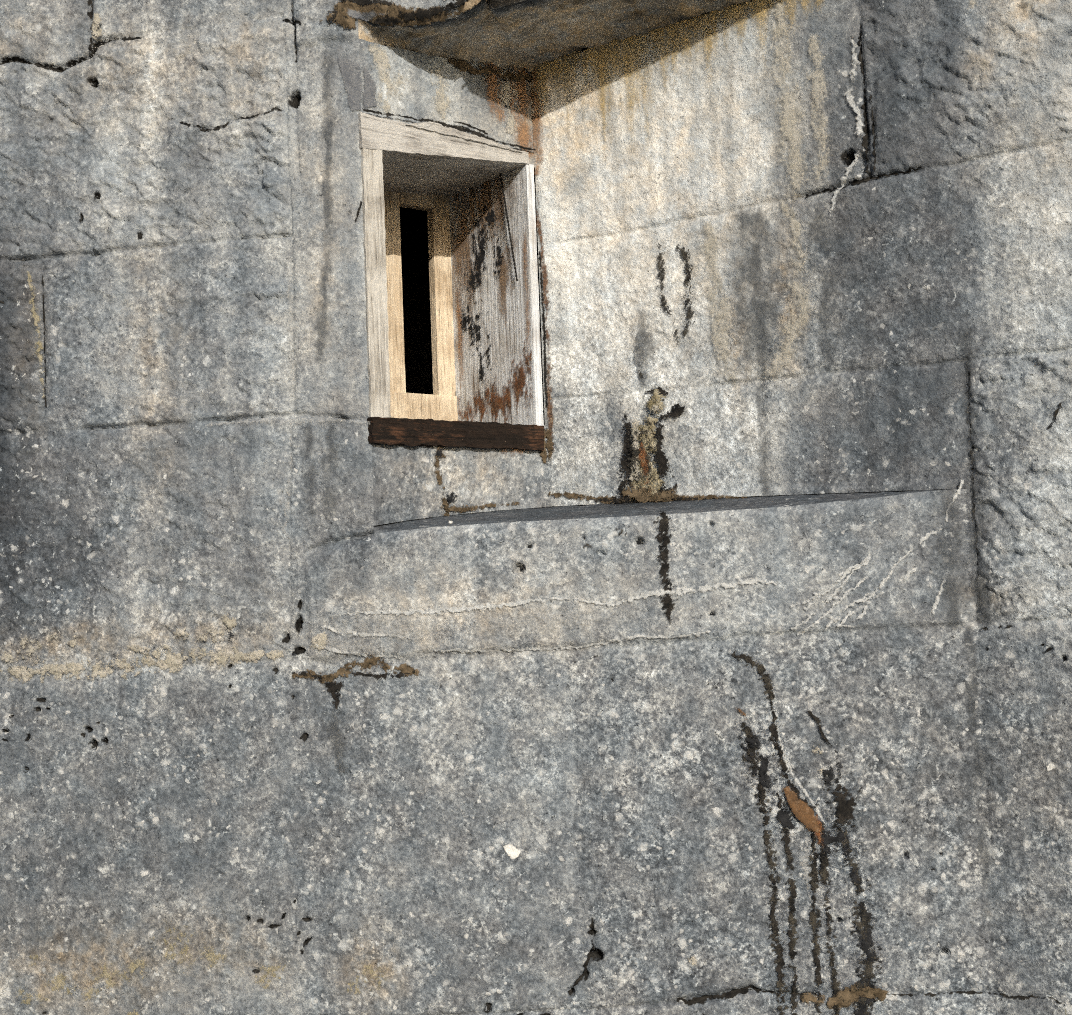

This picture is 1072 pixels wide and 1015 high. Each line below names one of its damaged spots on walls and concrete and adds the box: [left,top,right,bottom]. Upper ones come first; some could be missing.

crack [0,0,144,72]
crack [180,107,282,131]
water stain [536,0,864,385]
corrosion [458,202,554,463]
water stain [309,319,776,658]
water stain [975,578,991,618]
water stain [292,670,415,773]
water stain [730,651,884,1015]
crack [571,917,595,987]